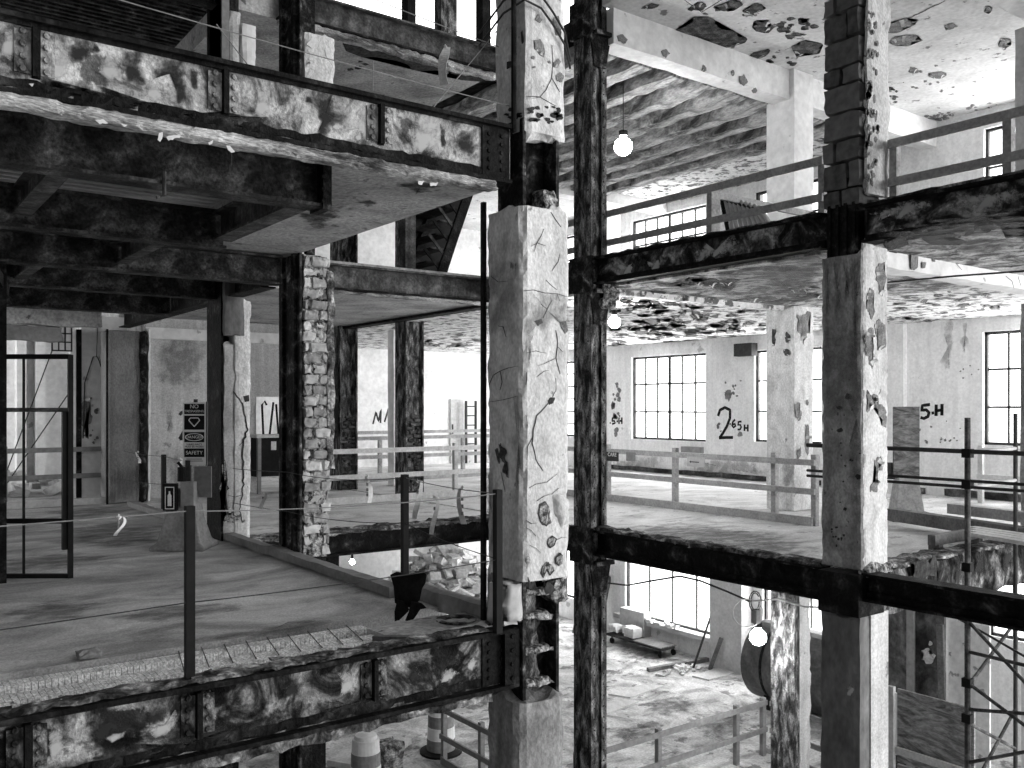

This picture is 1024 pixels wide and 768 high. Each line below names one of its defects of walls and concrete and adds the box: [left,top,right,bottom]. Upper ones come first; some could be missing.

crack [526,49,560,106]
peeling [676,0,823,66]
peeling [864,1,954,186]
peeling [998,38,1011,51]
crack [489,212,568,488]
peeling [607,277,822,356]
peeling [864,192,1024,368]
crack [228,391,249,523]
peeling [795,400,812,459]
peeling [836,393,885,492]
peeling [866,390,887,428]
flaking render [526,488,565,594]